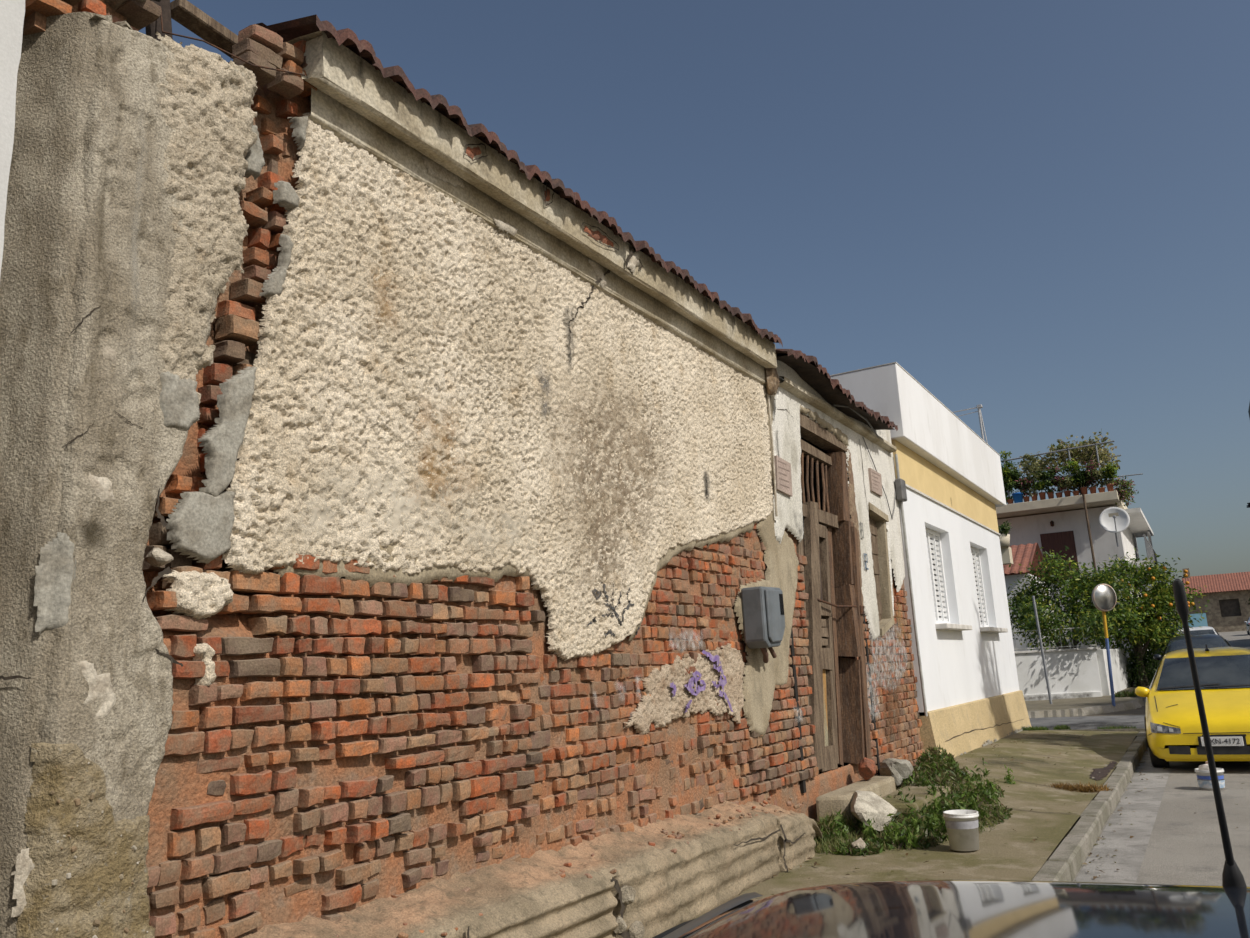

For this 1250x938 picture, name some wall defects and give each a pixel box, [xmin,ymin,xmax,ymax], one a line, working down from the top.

peeling [159,371,200,430]
crack [568,245,643,346]
spalling [11,522,819,938]
spalling [800,405,925,779]